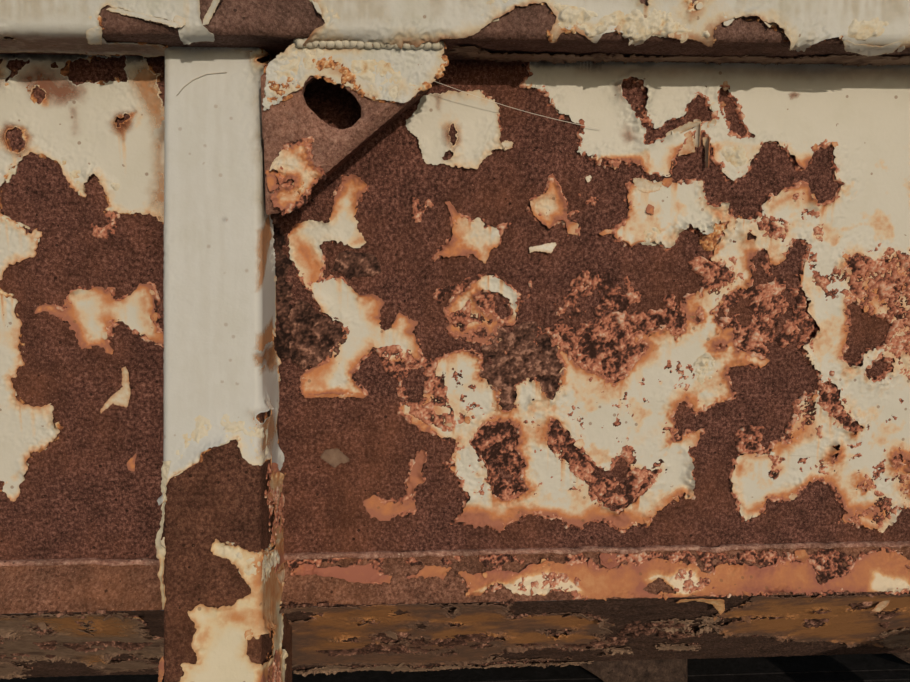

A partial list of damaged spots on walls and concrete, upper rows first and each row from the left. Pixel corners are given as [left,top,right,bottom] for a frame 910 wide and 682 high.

corrosion [0,39,164,125]
corrosion [155,172,164,202]
peeling [0,0,449,610]
peeling [287,0,910,534]
corrosion [263,416,275,450]
peeling [180,461,910,682]
peeling [0,610,164,682]